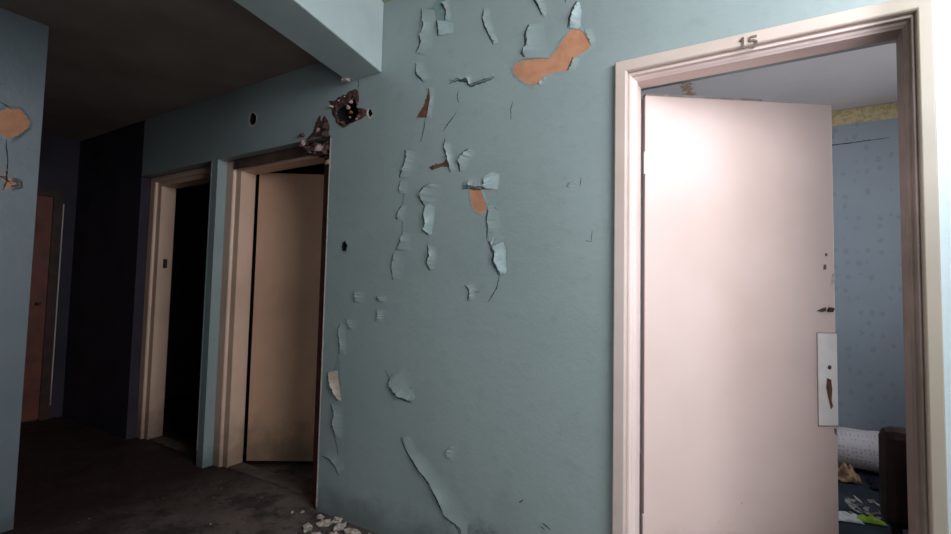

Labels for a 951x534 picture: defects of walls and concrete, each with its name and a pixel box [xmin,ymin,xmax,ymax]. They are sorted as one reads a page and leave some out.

peeling [510,0,596,89]
peeling [0,102,33,143]
spalling [329,77,373,128]
peeling [391,0,508,301]
peeling [316,138,347,507]
peeling [401,437,470,534]